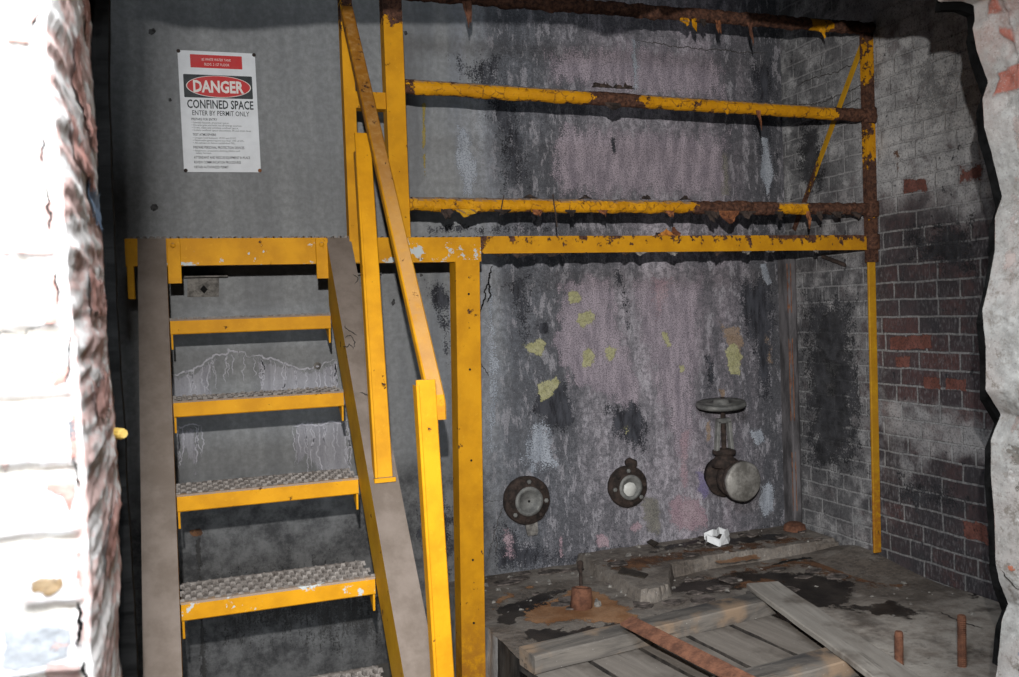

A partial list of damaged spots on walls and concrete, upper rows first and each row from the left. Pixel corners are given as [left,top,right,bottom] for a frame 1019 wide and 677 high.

crack [32,0,42,28]
water stain [446,50,511,85]
crack [40,134,53,230]
water stain [454,123,479,197]
water stain [478,99,737,201]
peeling [0,199,56,255]
water stain [171,349,339,397]
water stain [797,283,869,485]
water stain [176,423,205,476]
water stain [292,418,352,472]
rust [523,590,638,626]
water stain [672,571,927,620]